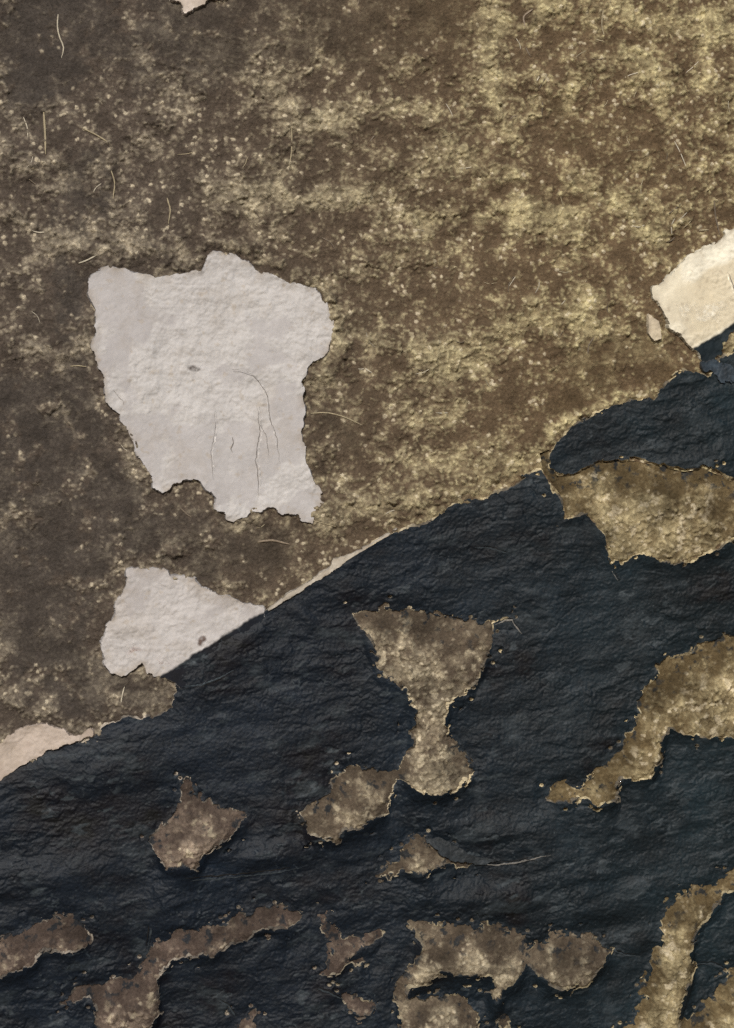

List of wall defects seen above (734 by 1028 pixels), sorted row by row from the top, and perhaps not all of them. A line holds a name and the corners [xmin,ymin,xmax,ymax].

spalling [0,0,734,778]
spalling [295,595,518,848]
spalling [539,632,734,812]
spalling [140,772,247,872]
spalling [0,911,94,979]
spalling [56,897,302,1028]
spalling [312,902,385,1024]
spalling [391,913,615,1028]
spalling [611,866,734,1028]